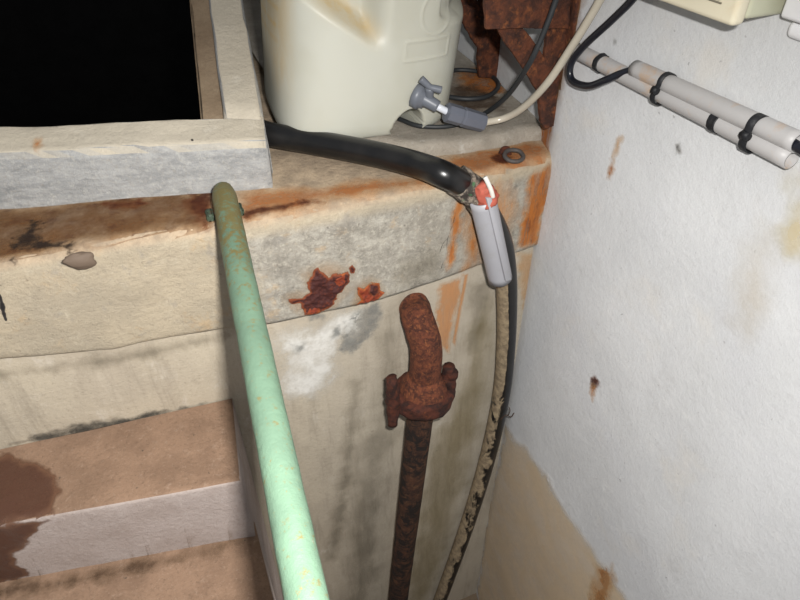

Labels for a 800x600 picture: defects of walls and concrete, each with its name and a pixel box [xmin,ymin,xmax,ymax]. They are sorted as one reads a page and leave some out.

corrosion [0,193,212,258]
corrosion [449,202,463,264]
corrosion [451,125,552,246]
corrosion [437,269,467,349]
water stain [283,311,360,395]
water stain [0,453,61,583]